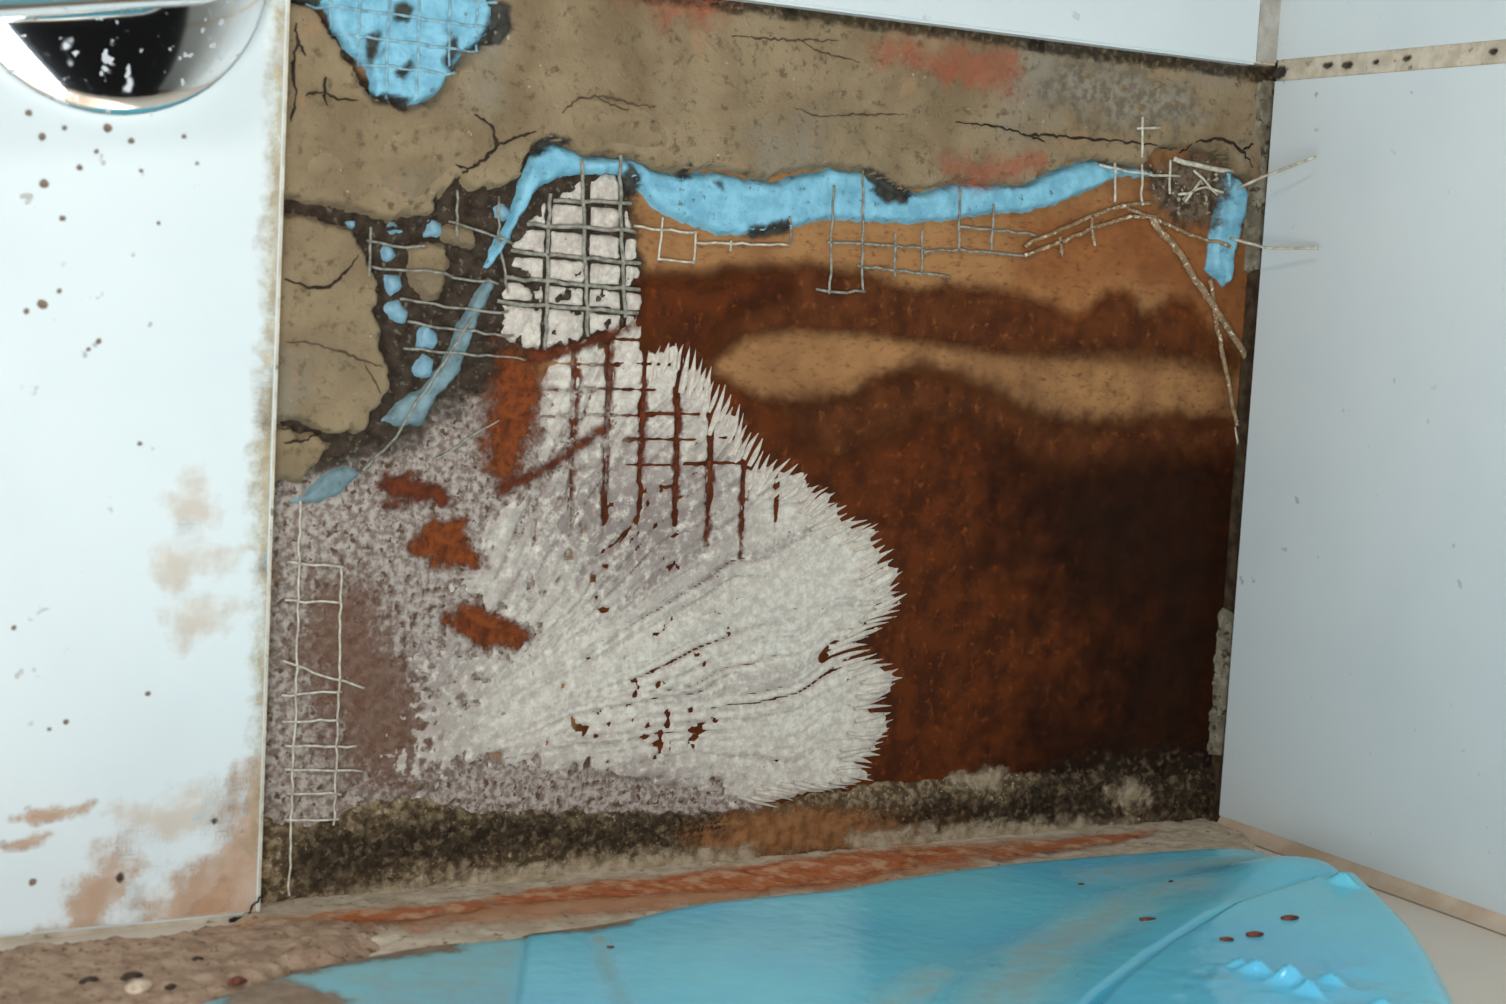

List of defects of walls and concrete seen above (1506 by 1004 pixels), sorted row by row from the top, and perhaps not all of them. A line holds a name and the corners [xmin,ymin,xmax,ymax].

leakage [276,0,370,93]
crack [290,23,358,122]
peeling [318,0,491,106]
peeling [423,220,443,238]
crack [284,94,656,301]
spalling [1147,151,1234,230]
peeling [380,222,438,378]
corrosion [376,470,482,570]
corrosion [670,396,683,517]
leakage [255,62,1241,903]
corrosion [441,596,542,654]
corrosion [283,830,1156,930]